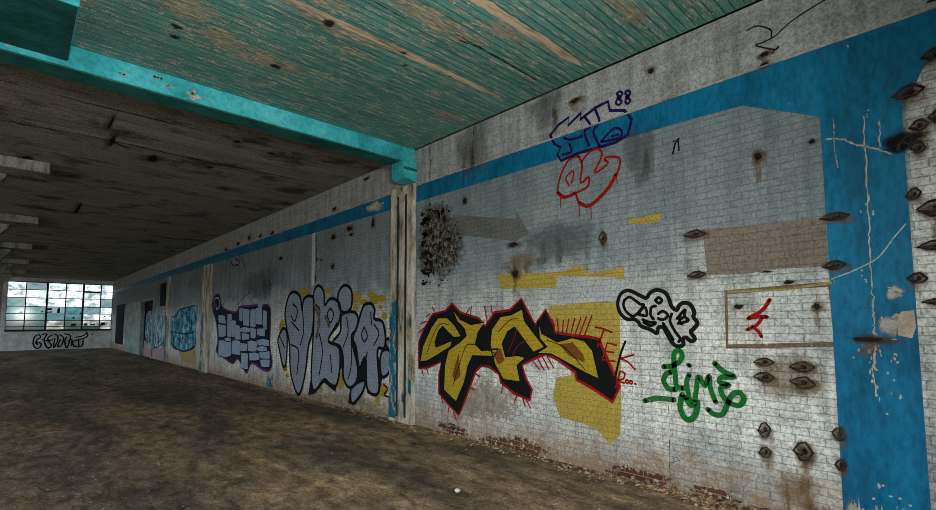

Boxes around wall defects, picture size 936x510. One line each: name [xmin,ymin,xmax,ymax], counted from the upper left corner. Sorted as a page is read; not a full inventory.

crack [826,116,892,397]
peeling [887,286,903,299]
peeling [853,310,916,401]